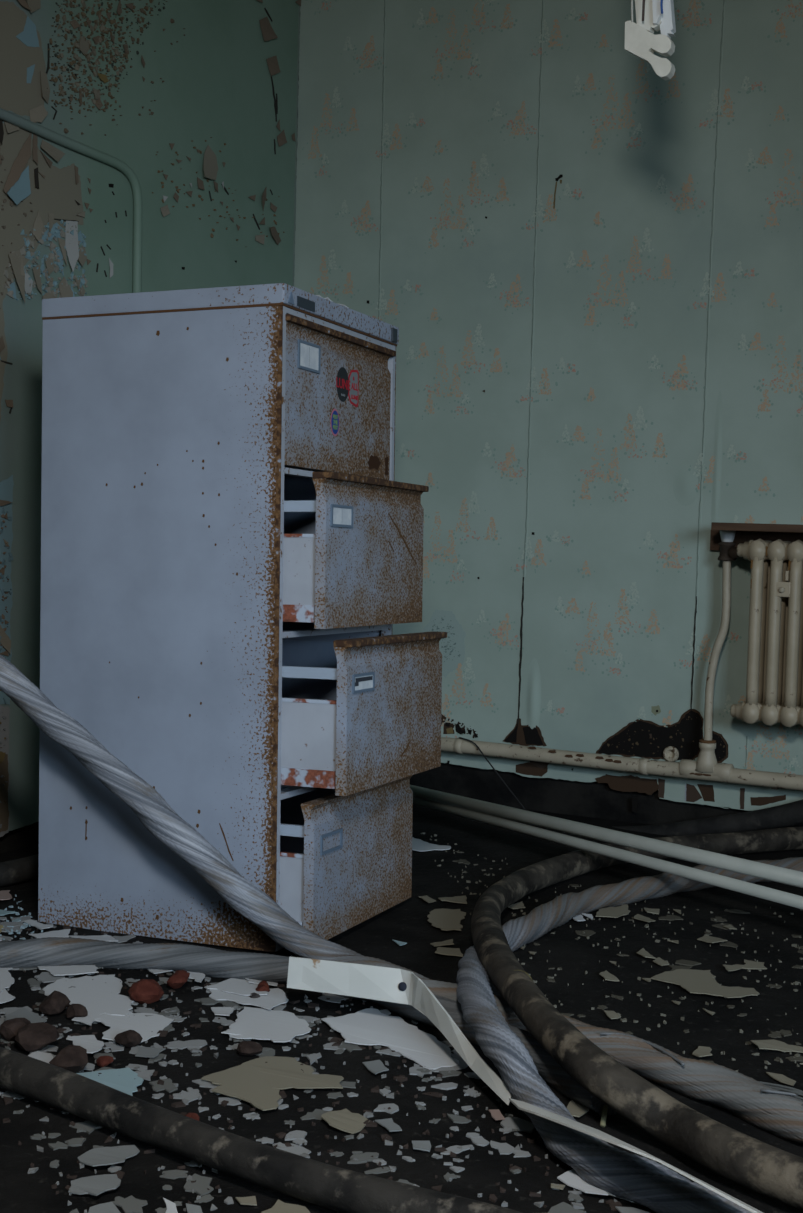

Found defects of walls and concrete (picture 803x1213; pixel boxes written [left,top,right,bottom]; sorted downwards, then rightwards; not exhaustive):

flaking render [0,0,154,421]